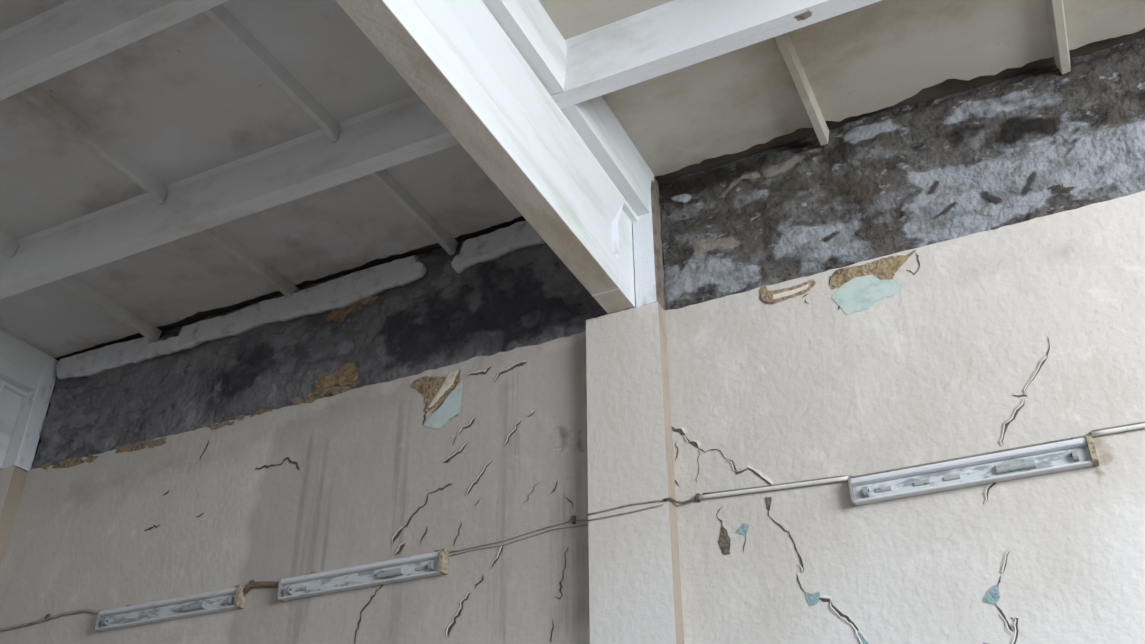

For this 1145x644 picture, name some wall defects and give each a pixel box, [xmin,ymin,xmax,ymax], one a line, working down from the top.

spalling [659,38,1145,315]
spalling [30,237,608,470]
crack [467,360,527,382]
crack [997,338,1050,446]
crack [391,409,535,555]
crack [523,481,573,507]
crack [672,426,868,644]
crack [982,482,996,504]
crack [354,585,383,644]
crack [446,544,503,638]
crack [550,548,568,643]
crack [983,550,1018,644]